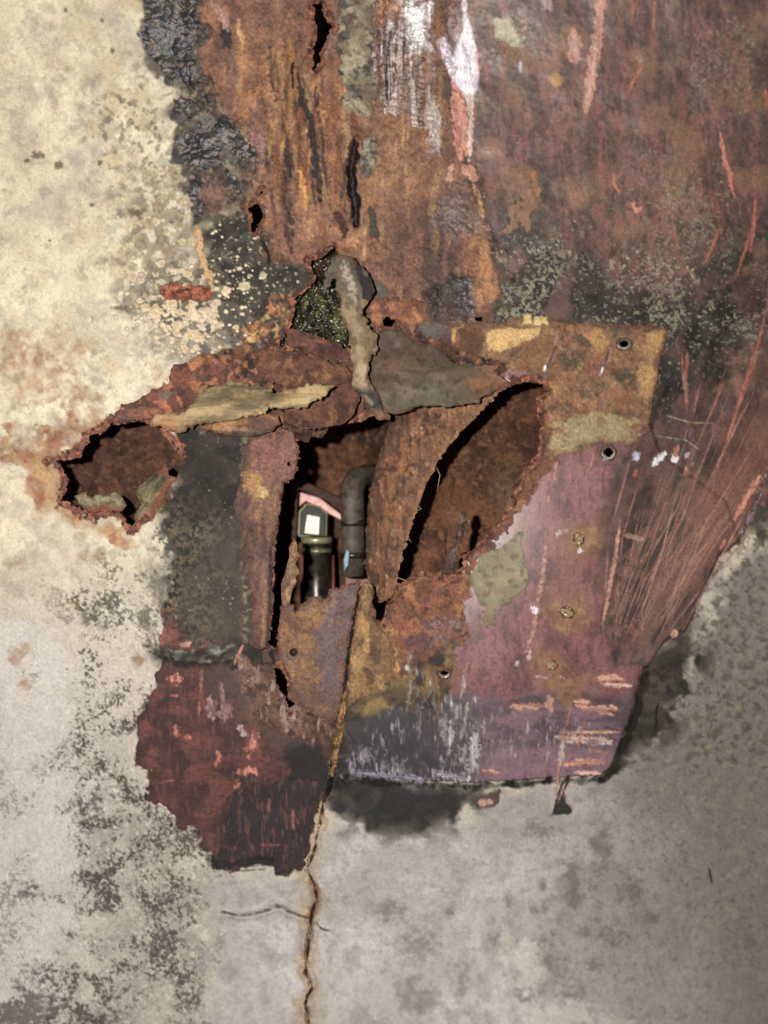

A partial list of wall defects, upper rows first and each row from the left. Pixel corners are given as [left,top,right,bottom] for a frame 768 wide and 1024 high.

corrosion [159,224,215,302]
peeling [324,254,391,420]
corrosion [0,293,367,549]
peeling [150,381,335,433]
corrosion [194,0,666,777]
peeling [470,532,529,628]
crack [343,595,358,695]
corrosion [301,803,326,932]
corrosion [294,949,317,1024]